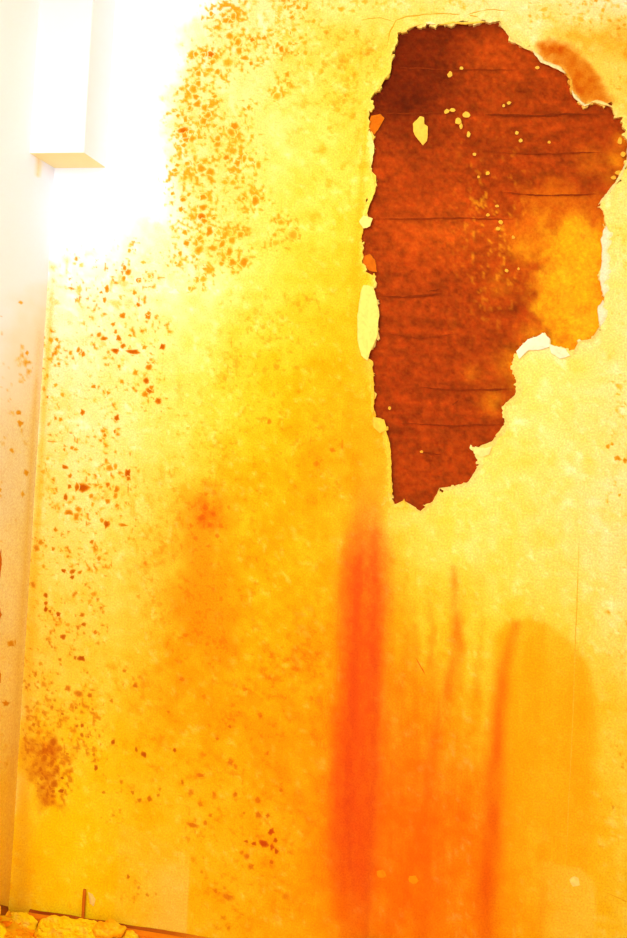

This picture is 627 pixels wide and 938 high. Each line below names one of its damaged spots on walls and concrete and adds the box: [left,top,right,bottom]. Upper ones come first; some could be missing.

spalling [348,8,627,526]
rust [541,35,611,92]
rust [314,477,403,938]
rust [466,616,524,938]